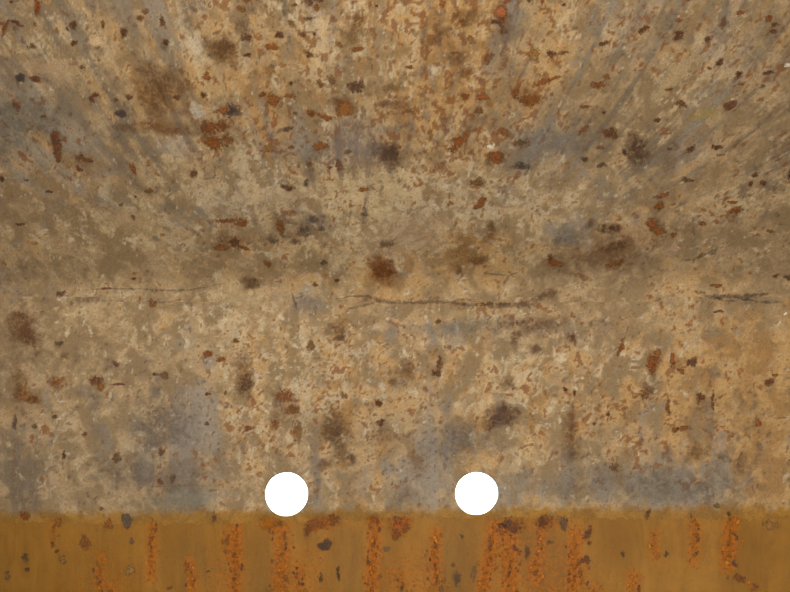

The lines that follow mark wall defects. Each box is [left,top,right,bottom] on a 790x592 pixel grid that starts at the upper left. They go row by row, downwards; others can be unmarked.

corrosion [1,0,42,37]
corrosion [204,34,252,60]
corrosion [265,31,284,50]
corrosion [529,48,568,61]
corrosion [307,80,365,121]
corrosion [511,75,561,106]
corrosion [199,103,243,152]
corrosion [645,192,677,238]
corrosion [370,241,396,280]
corrosion [431,355,443,377]
corrosion [645,348,698,375]
corrosion [276,389,303,442]